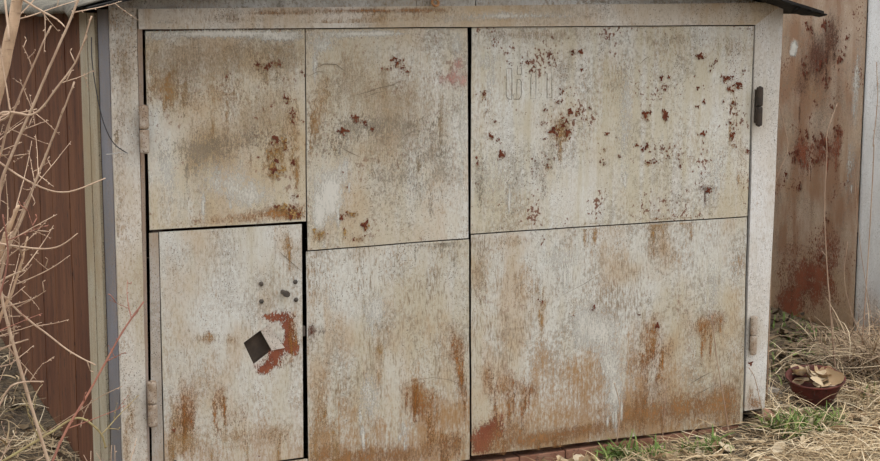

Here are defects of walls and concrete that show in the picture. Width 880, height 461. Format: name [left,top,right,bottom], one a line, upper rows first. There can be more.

rust [796,16,839,94]
rust [771,224,846,321]
rust [255,309,300,375]
rust [313,315,760,461]